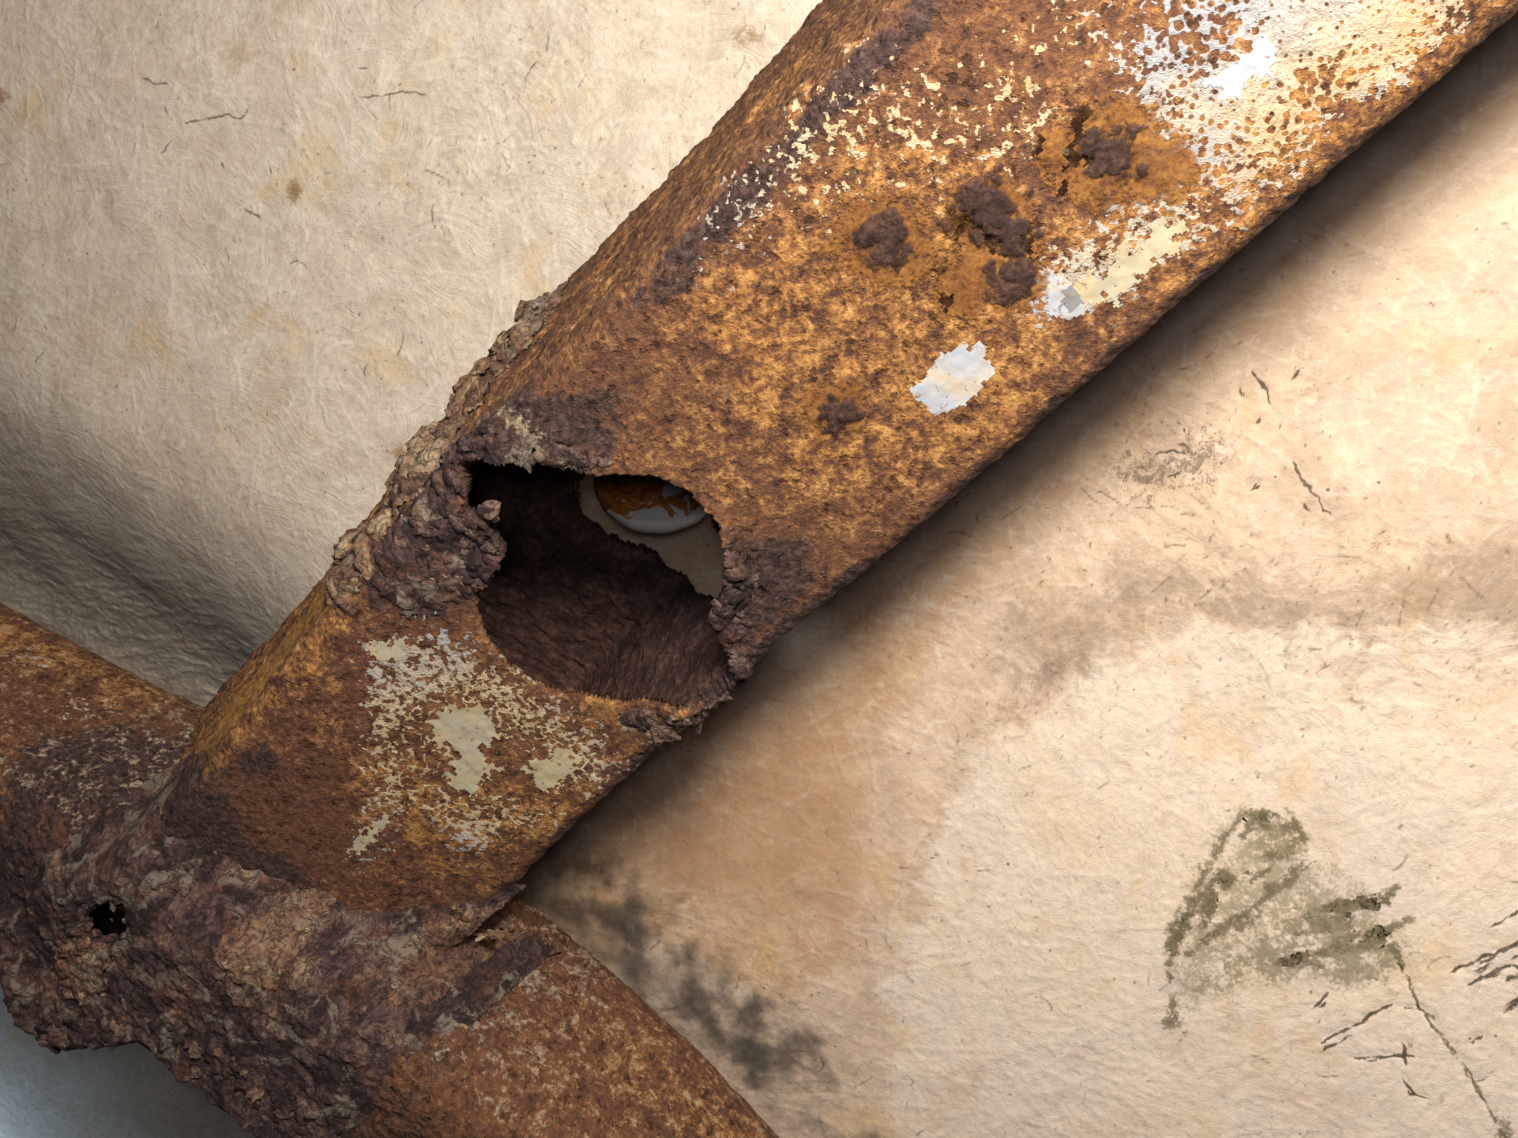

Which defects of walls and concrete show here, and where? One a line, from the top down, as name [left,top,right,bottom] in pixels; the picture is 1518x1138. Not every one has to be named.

peeling [1201,35,1277,105]
corrosion [816,86,1212,325]
peeling [1039,216,1190,320]
corrosion [324,277,571,619]
peeling [367,635,411,666]
peeling [425,703,587,797]
peeling [346,815,390,855]
corrosion [213,888,336,993]
corrosion [382,900,528,1007]
leakage [567,906,646,985]
leakage [1162,808,1413,1033]
corrosion [3,936,323,1137]